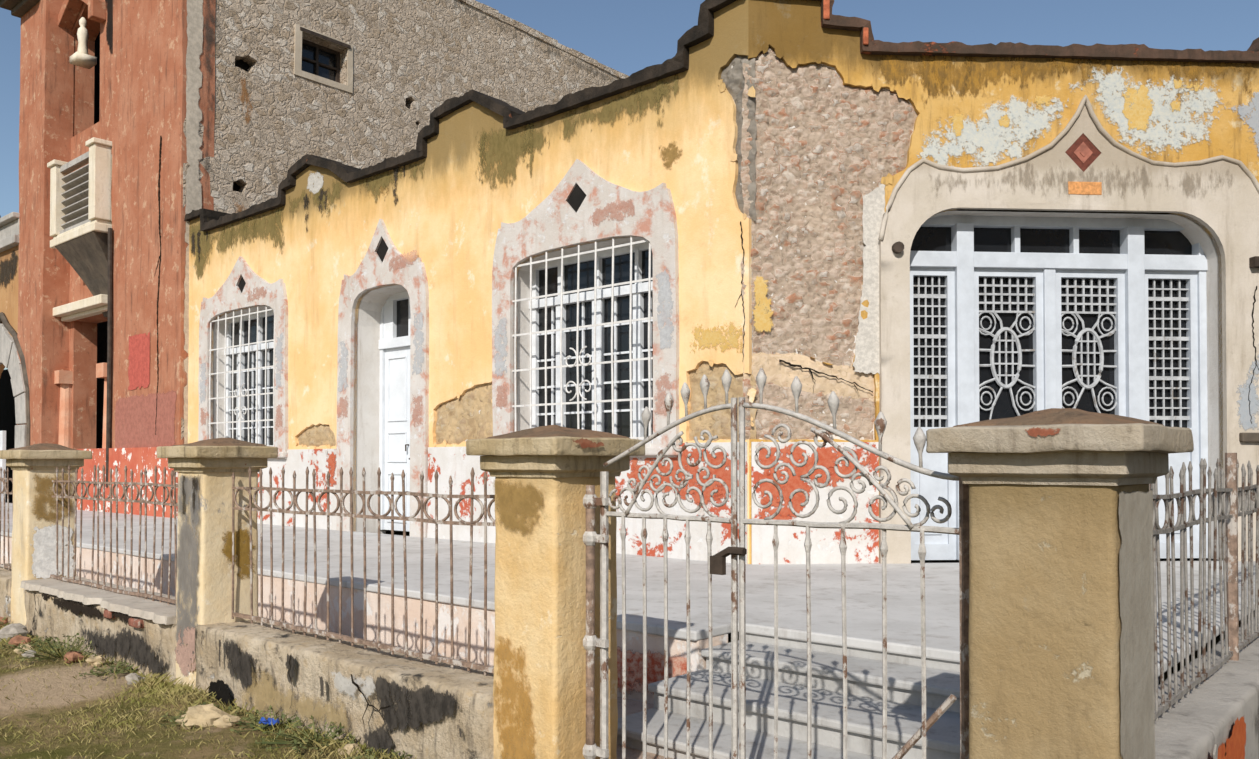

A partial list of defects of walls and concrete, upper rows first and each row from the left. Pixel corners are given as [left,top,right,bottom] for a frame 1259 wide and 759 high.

peeling [592,199,635,227]
flaking render [627,43,1259,520]
flaking render [294,342,348,490]
flaking render [412,312,508,447]
crack [1248,286,1259,423]
water stain [218,640,348,733]
water stain [363,675,463,757]
peeling [1212,717,1246,759]